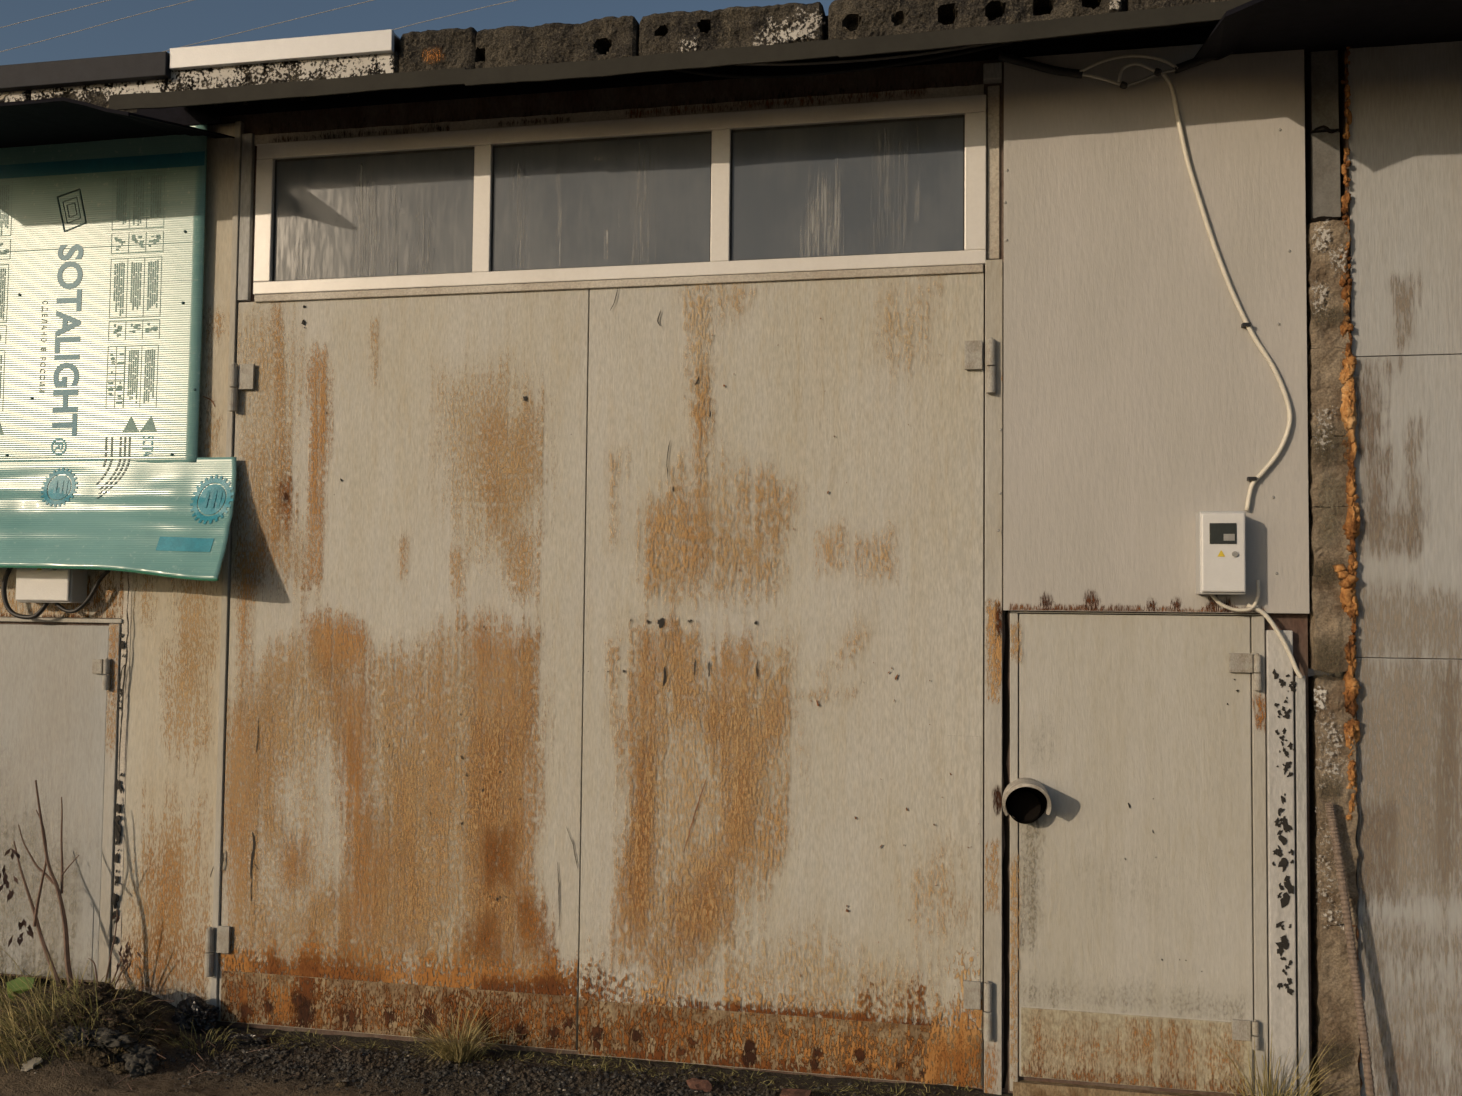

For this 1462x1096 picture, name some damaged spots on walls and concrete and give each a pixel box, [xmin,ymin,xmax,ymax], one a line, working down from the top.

peeling [1354,278,1421,557]
rust [119,284,1264,1094]
rust [1253,694,1266,729]
peeling [1272,669,1296,995]
peeling [1314,587,1462,1096]